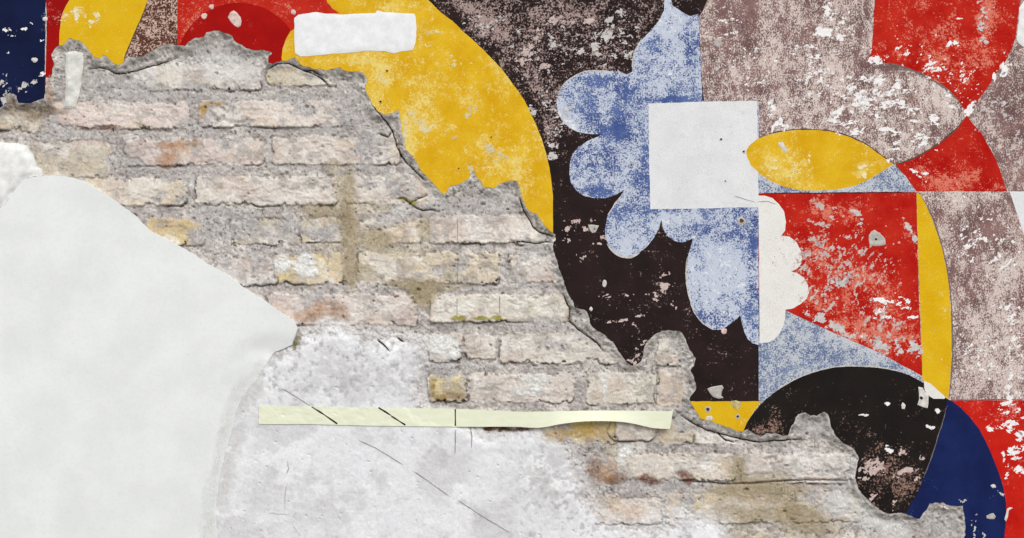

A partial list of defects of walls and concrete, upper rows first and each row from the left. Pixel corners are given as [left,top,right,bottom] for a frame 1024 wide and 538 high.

peeling [503,8,659,160]
peeling [702,0,1024,182]
peeling [484,142,509,163]
peeling [562,219,607,245]
peeling [625,272,677,310]
flaking render [772,199,924,360]
peeling [951,204,1024,496]
flaking render [707,385,741,410]
flaking render [884,387,940,430]
crack [360,441,508,532]
peeling [893,455,925,481]